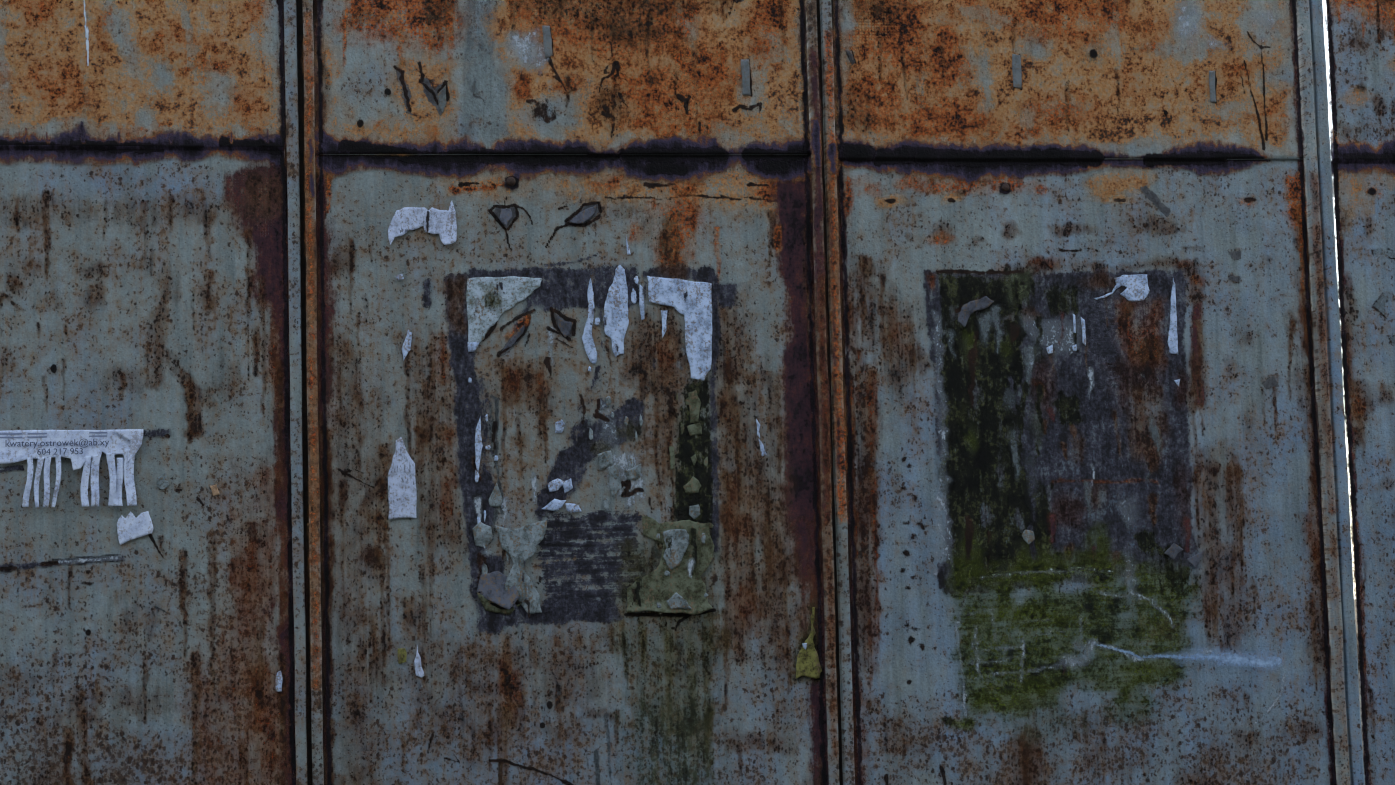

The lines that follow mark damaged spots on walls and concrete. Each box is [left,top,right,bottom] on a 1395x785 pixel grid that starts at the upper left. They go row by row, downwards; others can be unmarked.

corrosion [0,0,296,785]
peeling [481,307,577,357]
corrosion [299,0,1395,785]